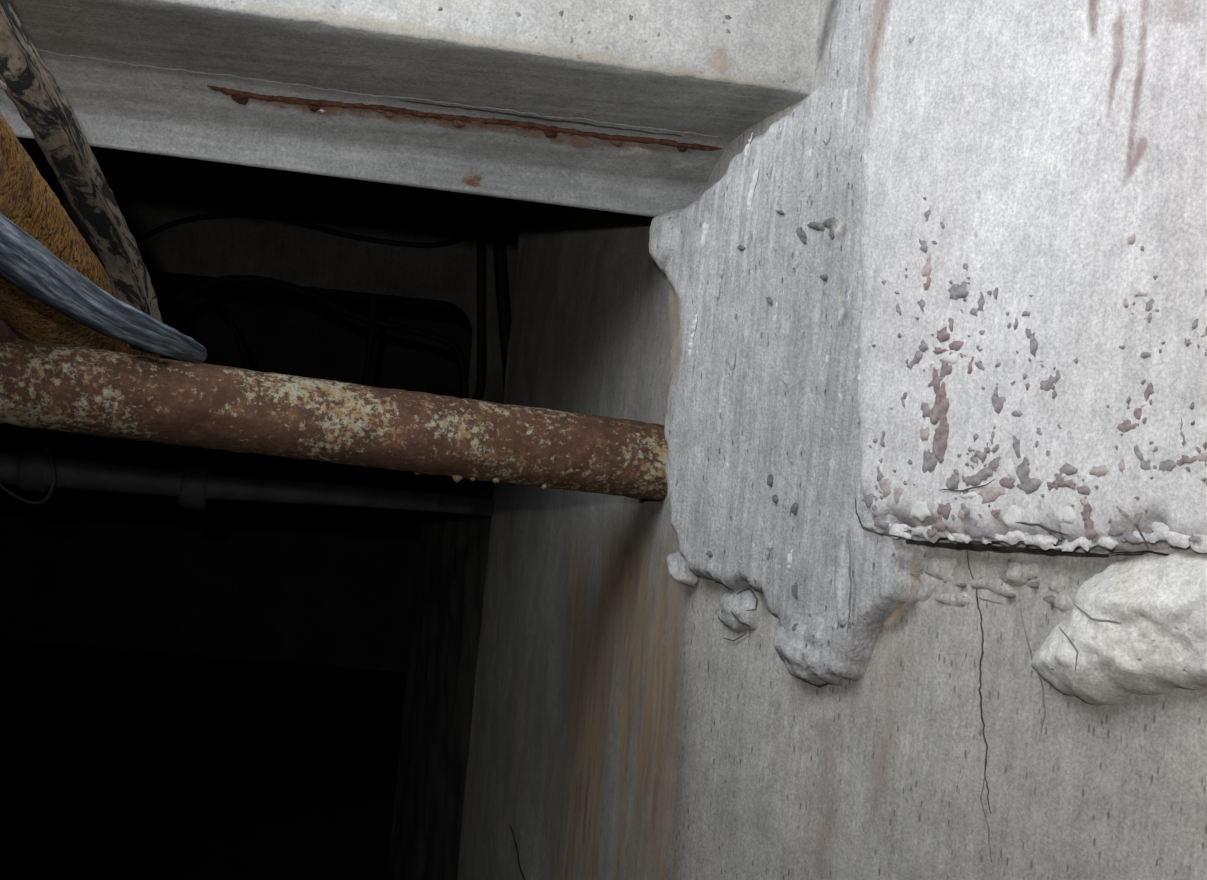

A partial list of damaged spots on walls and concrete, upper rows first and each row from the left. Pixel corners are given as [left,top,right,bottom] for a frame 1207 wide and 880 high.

spalling [868,0,888,66]
corrosion [1128,67,1142,170]
spalling [855,263,1207,612]
crack [906,539,1170,862]